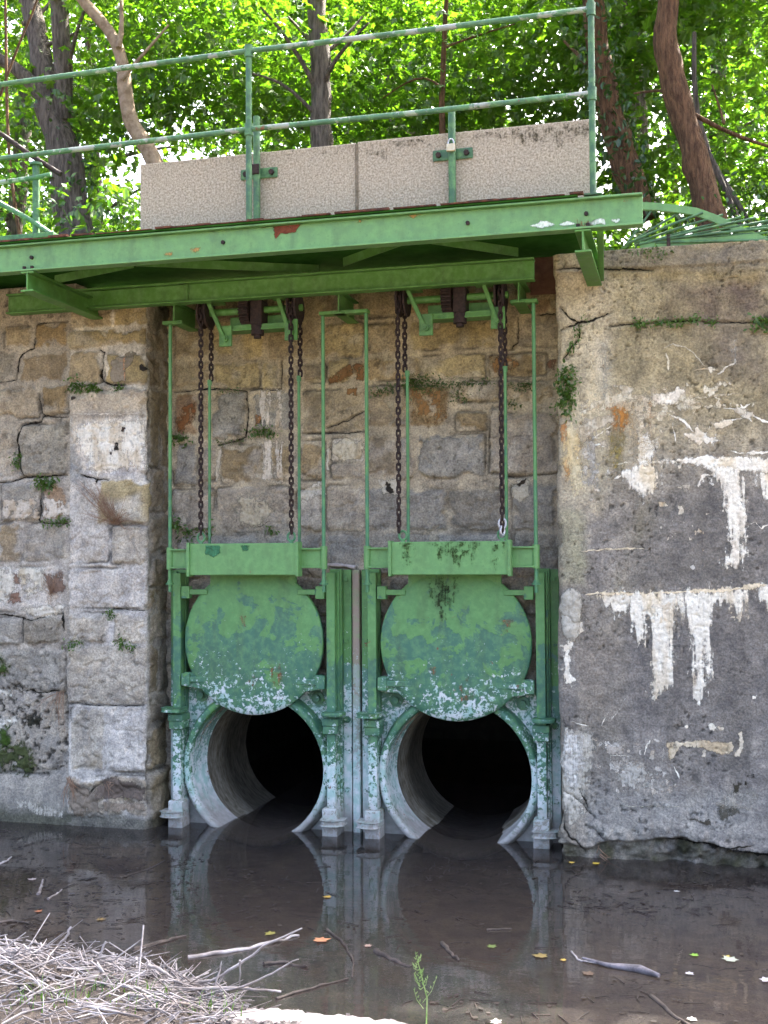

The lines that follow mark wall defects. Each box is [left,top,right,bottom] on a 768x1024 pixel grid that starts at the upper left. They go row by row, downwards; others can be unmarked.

corrosion [0,191,584,242]
crack [512,309,750,358]
corrosion [608,398,635,470]
leakage [613,401,768,569]
leakage [560,621,584,687]
leakage [585,582,768,705]
spalling [560,722,759,825]